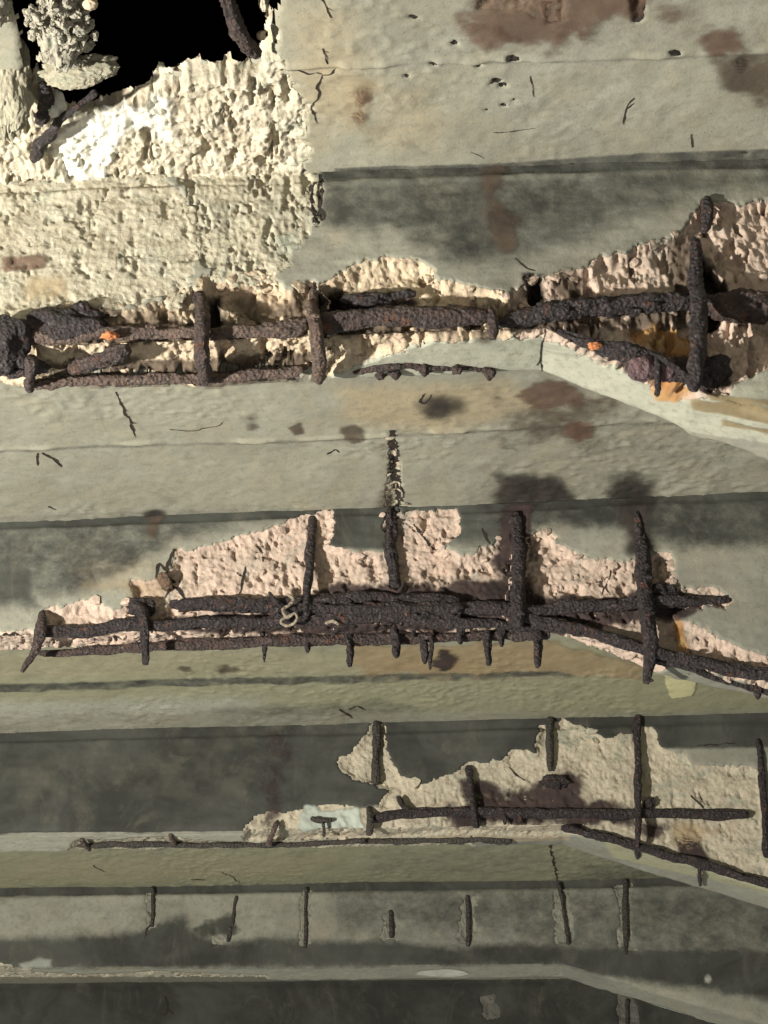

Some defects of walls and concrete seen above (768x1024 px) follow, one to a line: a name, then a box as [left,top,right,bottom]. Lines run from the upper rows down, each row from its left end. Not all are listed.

crack [295,49,335,123]
peeling [0,0,768,400]
corrosion [2,255,46,272]
corrosion [0,298,314,389]
corrosion [339,291,418,311]
corrosion [324,304,691,364]
corrosion [651,354,733,402]
spalling [0,432,768,699]
corrosion [298,475,639,628]
corrosion [653,582,696,655]
spalling [69,718,768,888]
corrosion [446,772,663,839]